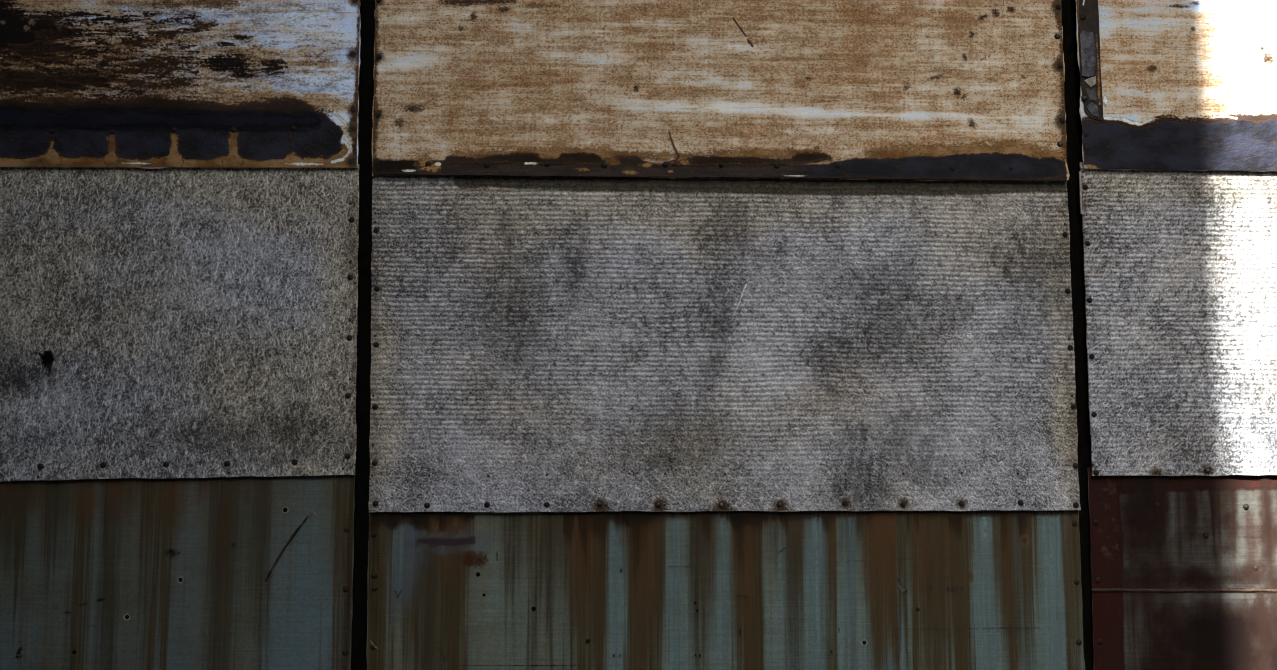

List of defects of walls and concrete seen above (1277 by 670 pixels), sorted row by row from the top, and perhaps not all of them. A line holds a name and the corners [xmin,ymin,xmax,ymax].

peeling [0,0,356,168]
corrosion [346,0,360,168]
corrosion [440,0,551,31]
peeling [435,139,1067,179]
corrosion [968,7,1015,38]
peeling [1080,30,1277,171]
corrosion [0,481,27,603]
corrosion [139,478,271,670]
corrosion [332,475,354,670]
corrosion [367,511,489,670]
corrosion [508,498,1085,670]
corrosion [1120,466,1277,670]